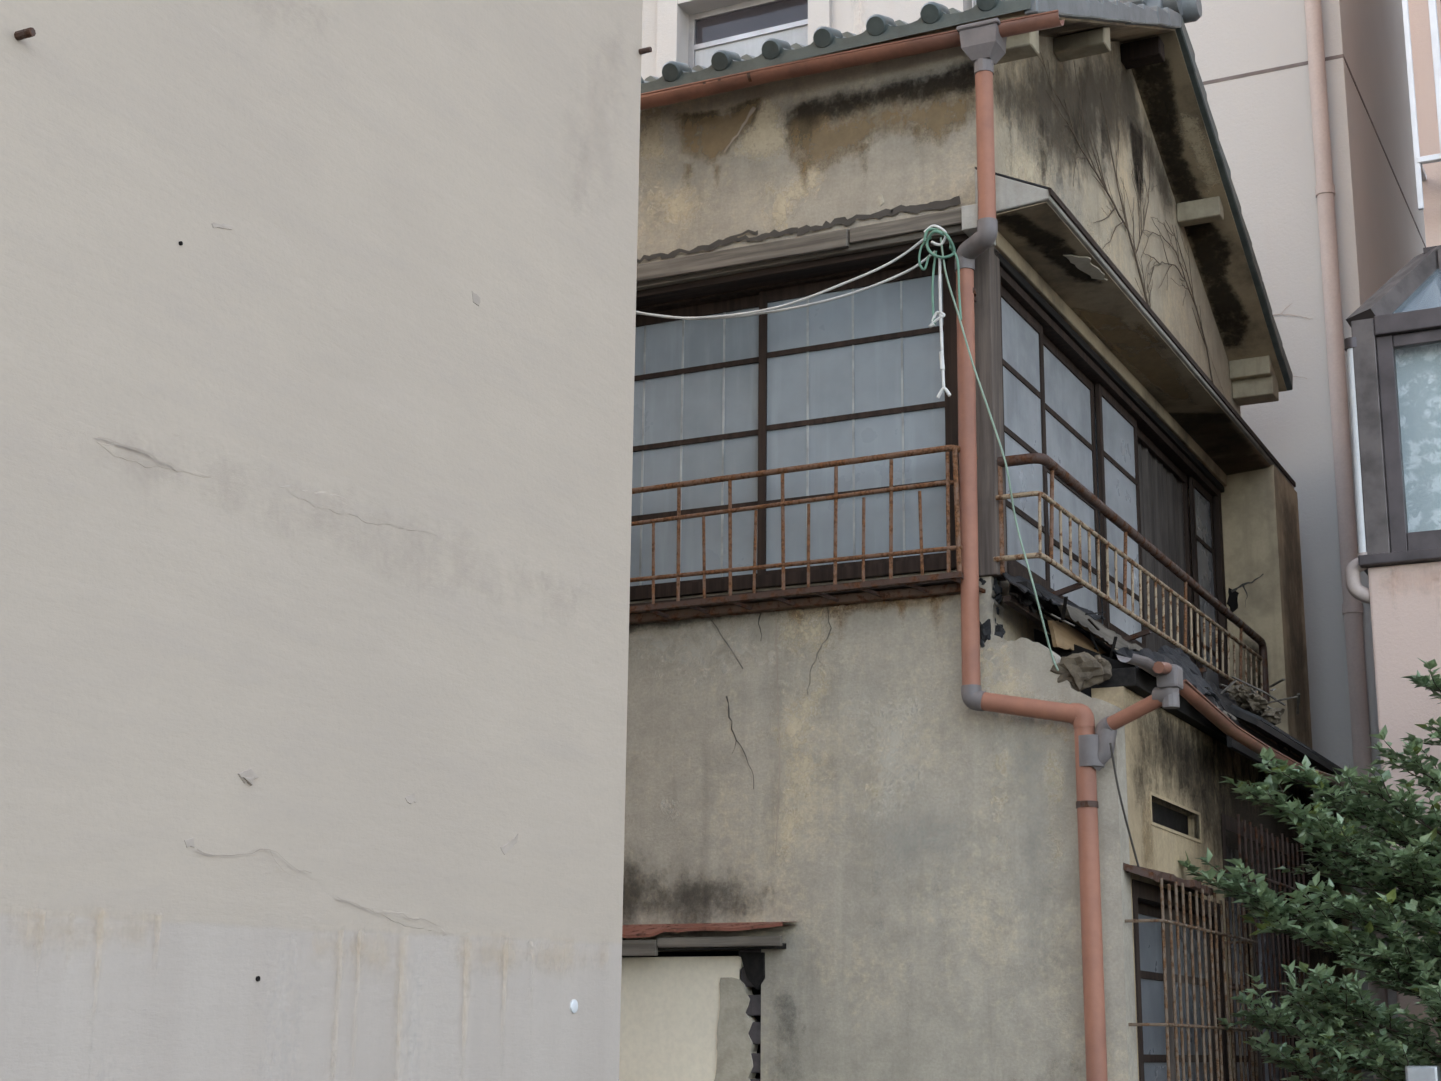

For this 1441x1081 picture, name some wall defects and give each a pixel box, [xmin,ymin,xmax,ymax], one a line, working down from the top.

water stain [678,100,759,174]
water stain [789,95,975,179]
spalling [1227,588,1239,612]
crack [807,606,832,694]
crack [711,613,762,789]
water stain [623,868,737,922]